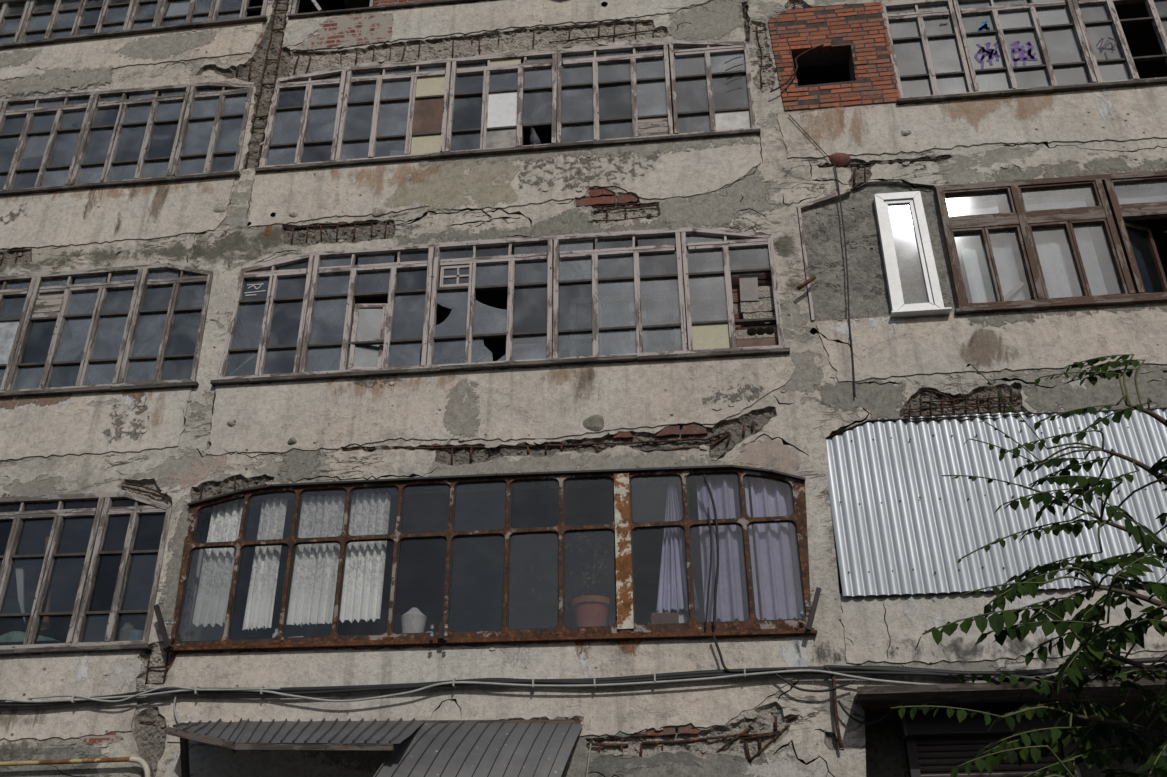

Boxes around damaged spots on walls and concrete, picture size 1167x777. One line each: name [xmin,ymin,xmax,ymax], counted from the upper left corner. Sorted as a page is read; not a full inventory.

peeling [0,27,221,98]
spalling [196,0,777,171]
crack [393,208,534,238]
peeling [281,135,781,247]
crack [995,142,1167,171]
peeling [103,390,150,443]
spalling [341,378,801,477]
peeling [781,349,1167,422]
peeling [98,448,321,692]
peeling [79,707,397,777]
crack [773,729,844,777]